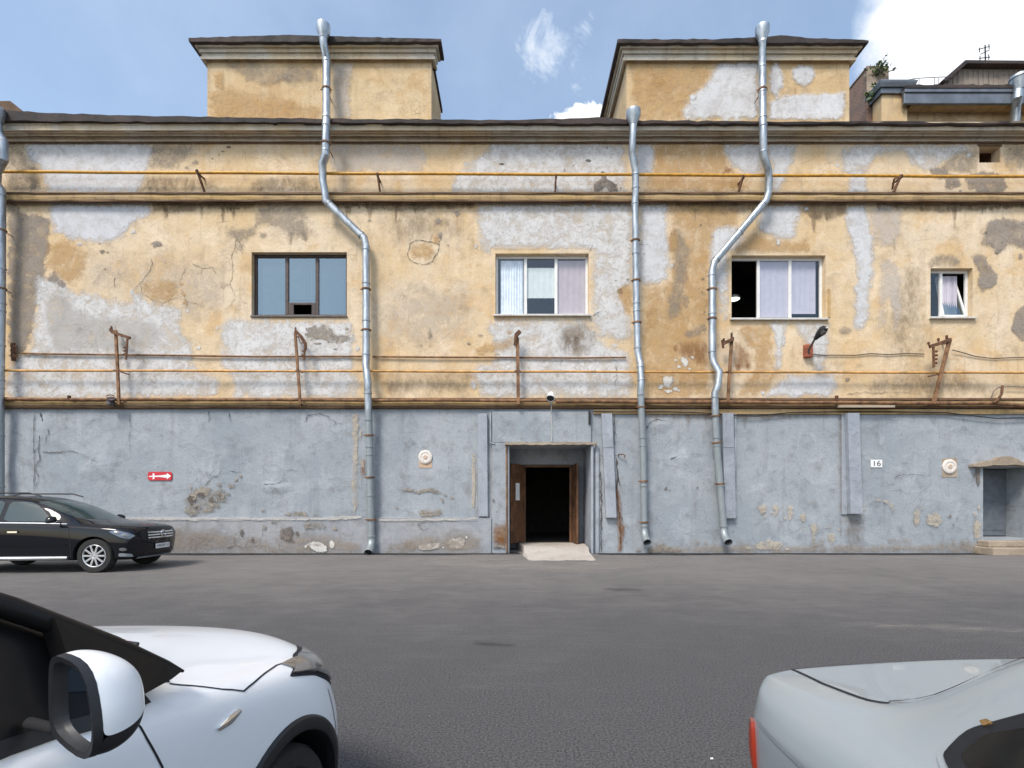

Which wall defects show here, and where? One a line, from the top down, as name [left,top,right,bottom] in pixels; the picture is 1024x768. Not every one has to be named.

peeling [769,61,783,99]
flaking render [6,203,65,356]
crack [114,233,242,312]
crack [407,234,442,265]
crack [33,413,92,491]
peeling [126,414,364,553]